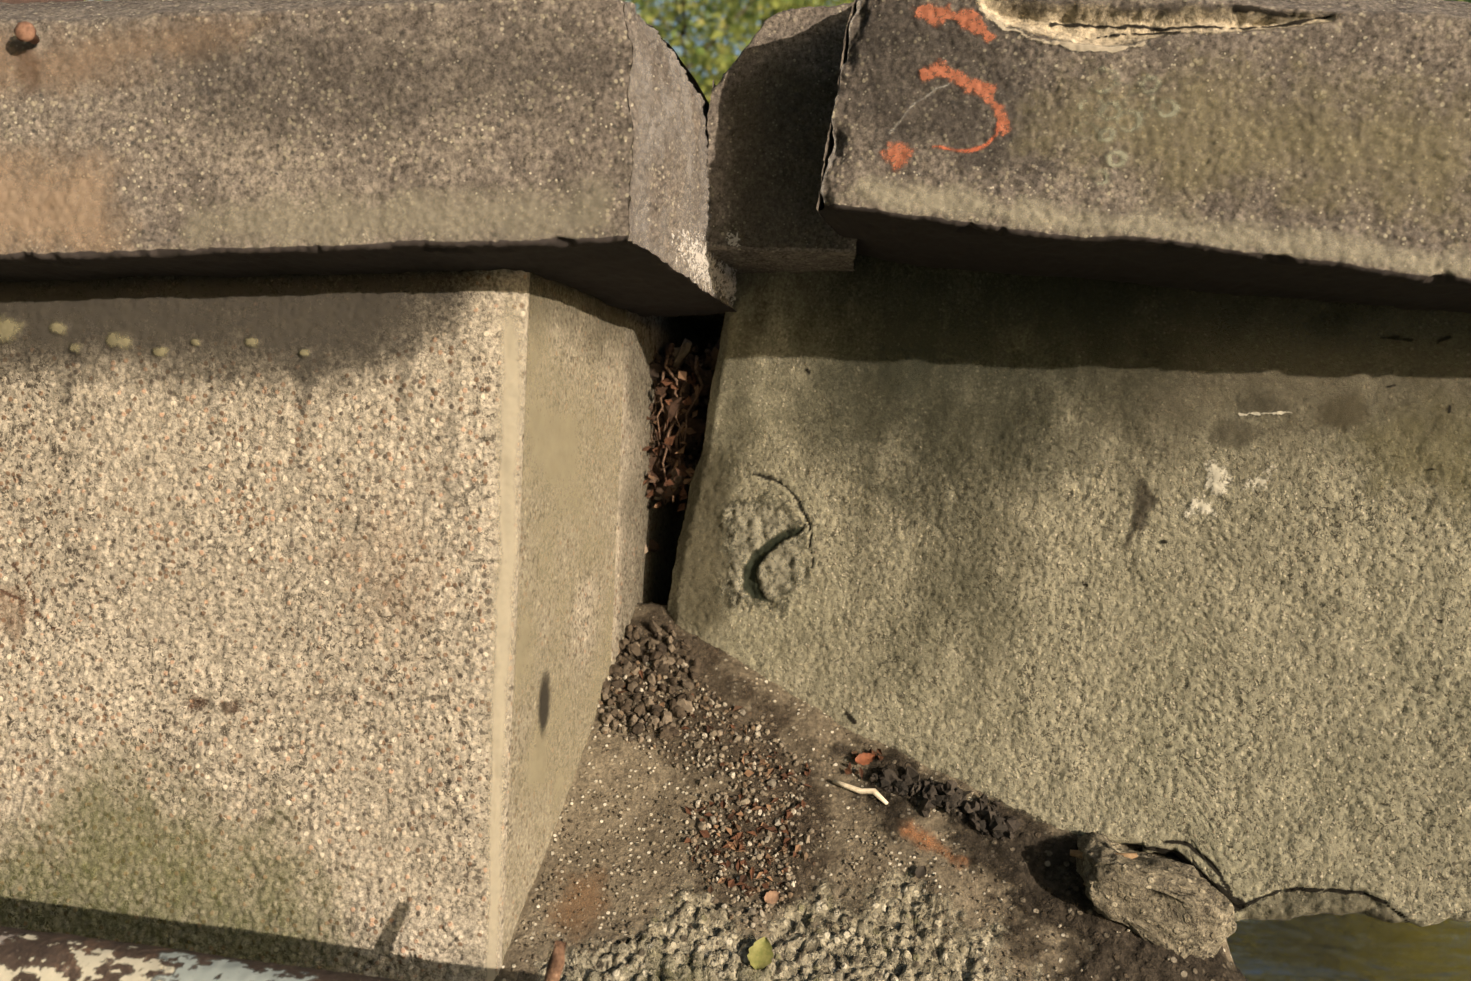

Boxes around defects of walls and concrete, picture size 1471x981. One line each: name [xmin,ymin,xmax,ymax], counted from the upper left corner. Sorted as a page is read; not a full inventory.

spalling [978,0,1345,53]
damp [788,254,1176,499]
crack [1121,840,1410,923]